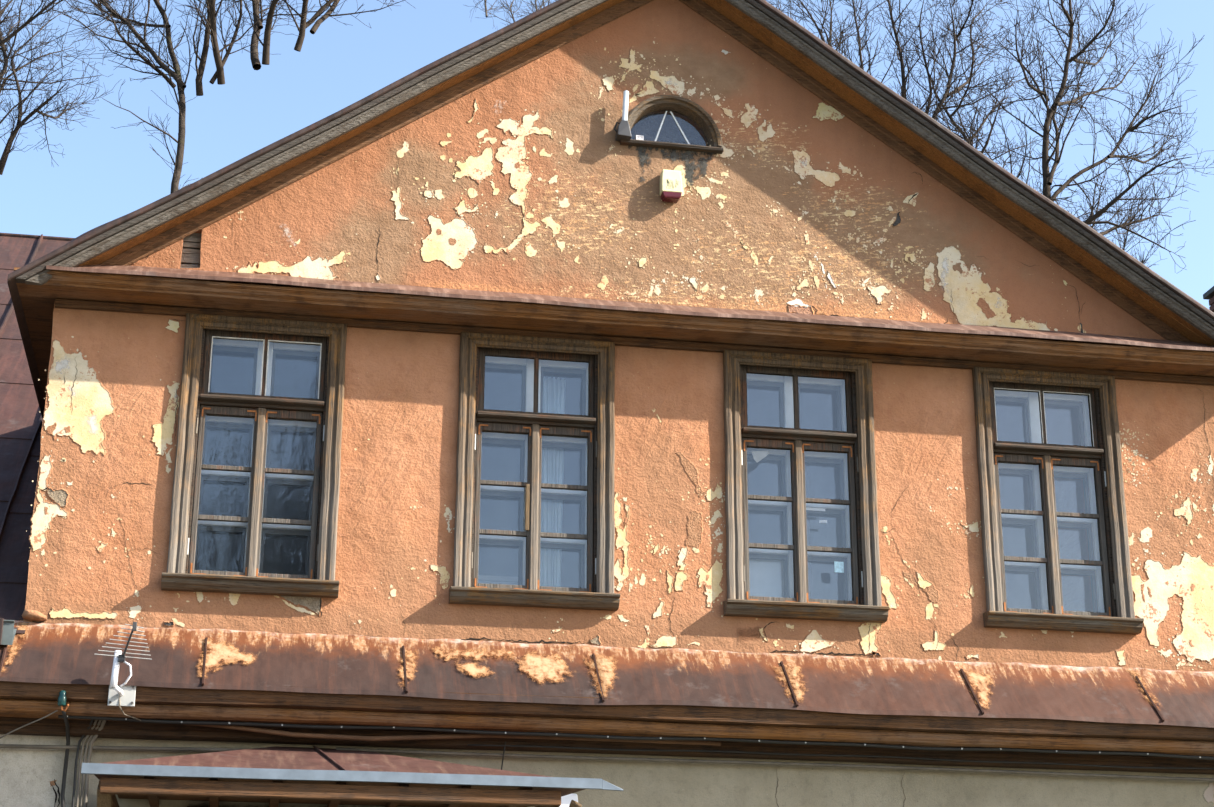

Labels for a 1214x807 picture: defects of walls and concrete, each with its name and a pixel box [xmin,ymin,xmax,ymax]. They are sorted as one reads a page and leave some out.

peeling [390,98,580,270]
damp [686,164,696,185]
peeling [590,41,1058,331]
peeling [26,336,122,576]
peeling [614,451,726,649]
peeling [1128,454,1214,670]
peeling [49,583,152,621]
corrosion [198,638,256,677]
corrosion [432,647,571,683]
corrosion [585,654,617,696]
corrosion [773,665,805,703]
corrosion [963,669,994,709]